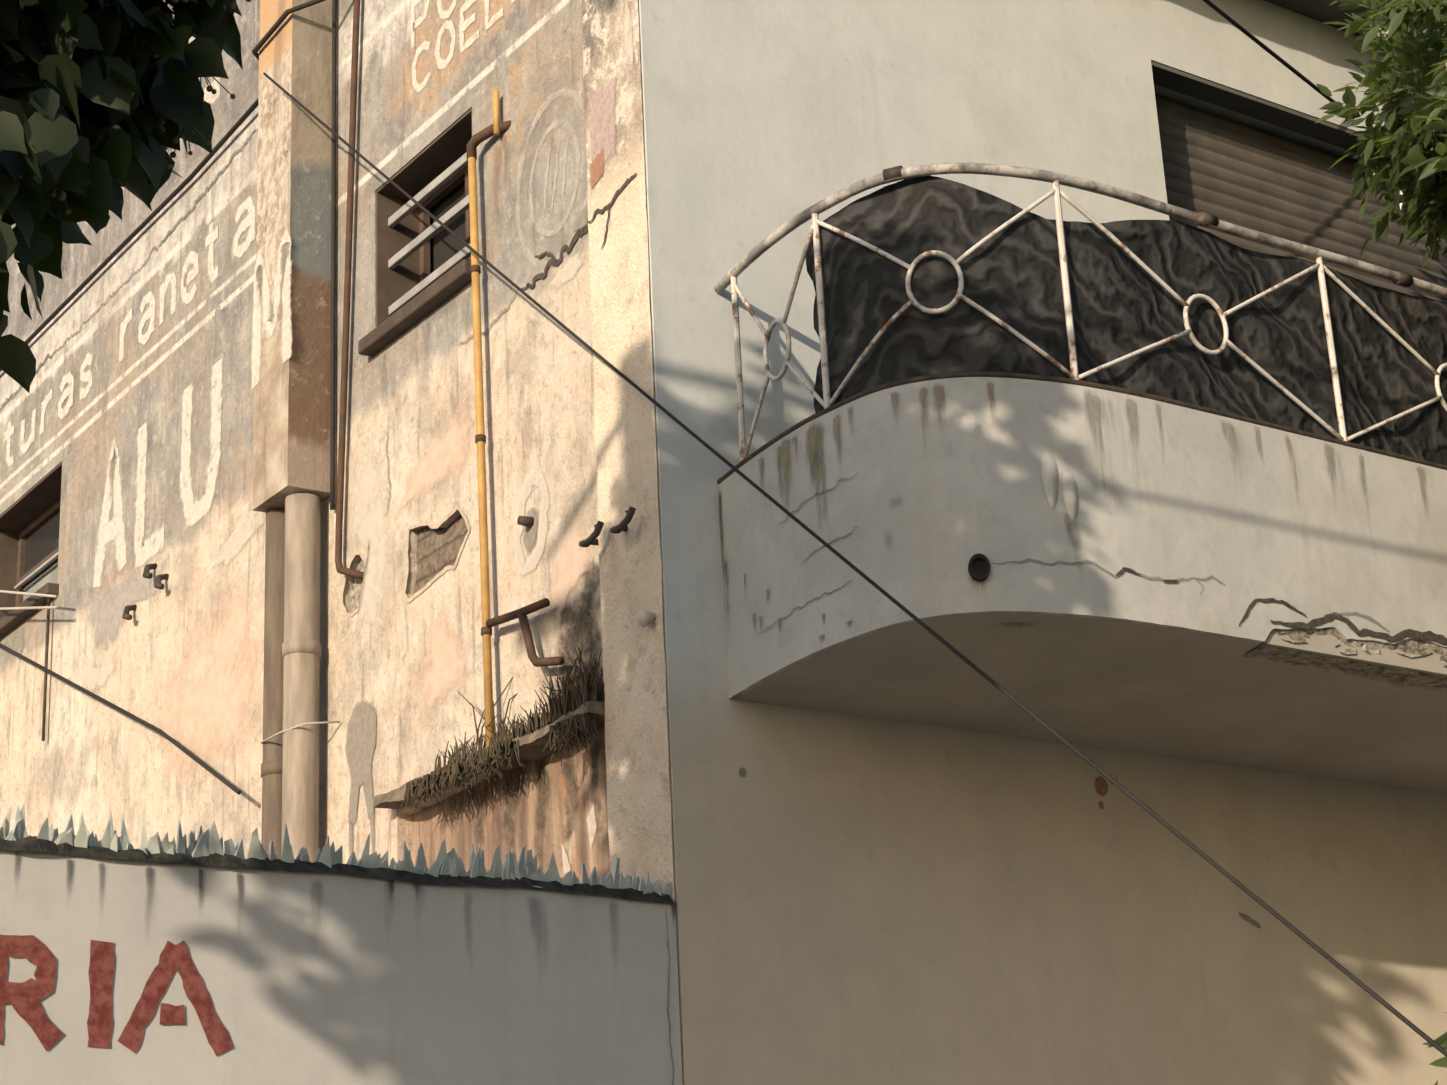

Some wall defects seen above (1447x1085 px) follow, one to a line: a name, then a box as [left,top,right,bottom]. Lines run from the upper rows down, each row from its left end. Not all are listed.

leakage [596,0,633,62]
crack [458,173,636,345]
peeling [341,406,469,623]
spalling [398,505,470,655]
leakage [555,564,600,695]
crack [992,558,1447,644]
spalling [1243,627,1447,690]